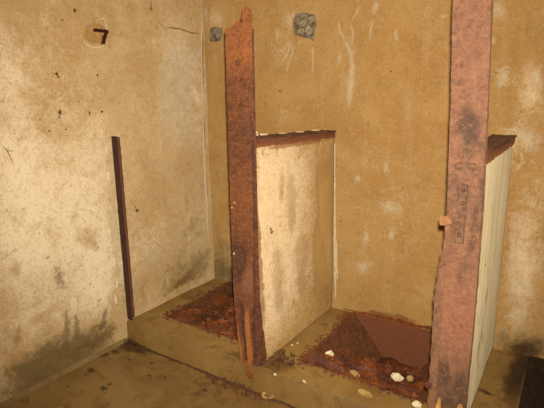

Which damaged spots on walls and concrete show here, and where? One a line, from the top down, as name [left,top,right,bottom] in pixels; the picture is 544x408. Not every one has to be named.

leakage [3,325,146,395]